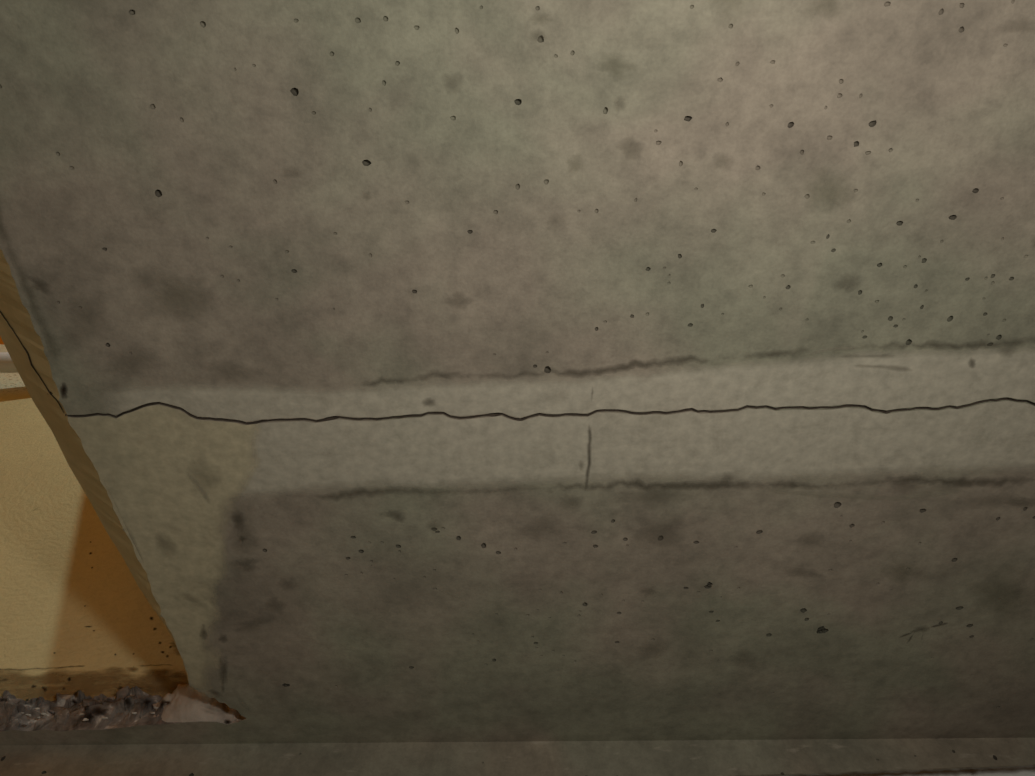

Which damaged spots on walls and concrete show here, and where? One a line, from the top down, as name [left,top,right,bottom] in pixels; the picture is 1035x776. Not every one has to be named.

crack [0,312,1035,475]
spalling [0,683,246,732]